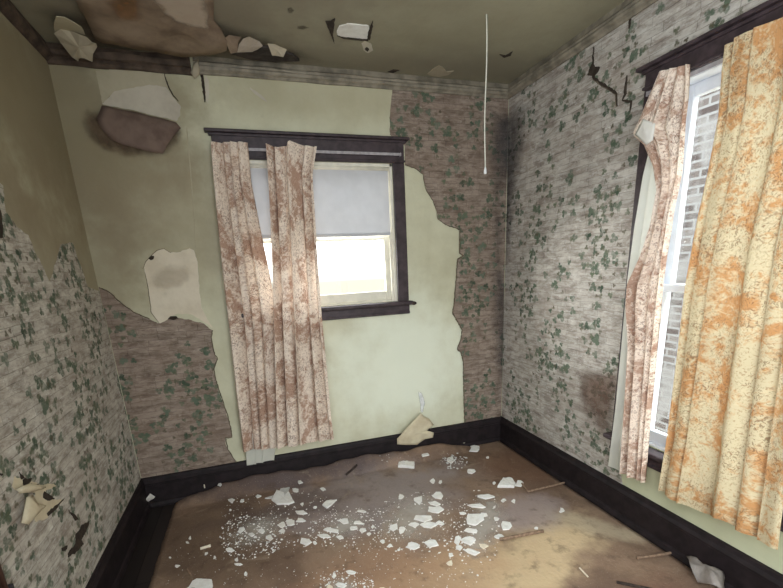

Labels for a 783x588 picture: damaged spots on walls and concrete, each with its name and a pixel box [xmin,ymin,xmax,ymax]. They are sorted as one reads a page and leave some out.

peeling [54,16,97,62]
flaking render [325,18,373,53]
flaking render [96,69,181,121]
crack [587,47,632,112]
flaking render [143,248,213,328]
peeling [15,483,46,525]